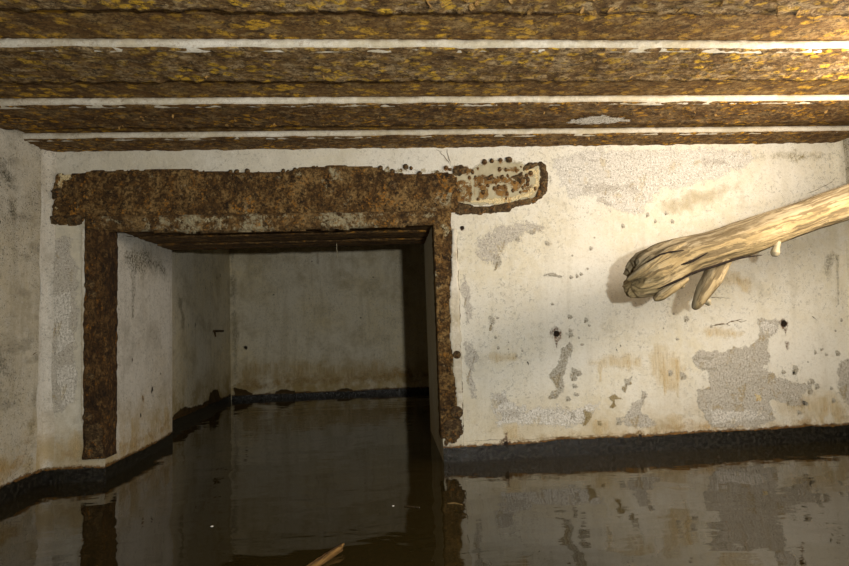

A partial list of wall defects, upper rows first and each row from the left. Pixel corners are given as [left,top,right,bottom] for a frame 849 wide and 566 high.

corrosion [378,157,548,215]
corrosion [50,214,83,226]
peeling [491,314,657,428]
peeling [693,317,819,428]
peeling [814,348,849,404]
corrosion [84,423,104,458]
corrosion [444,418,464,446]
leakage [443,422,849,463]